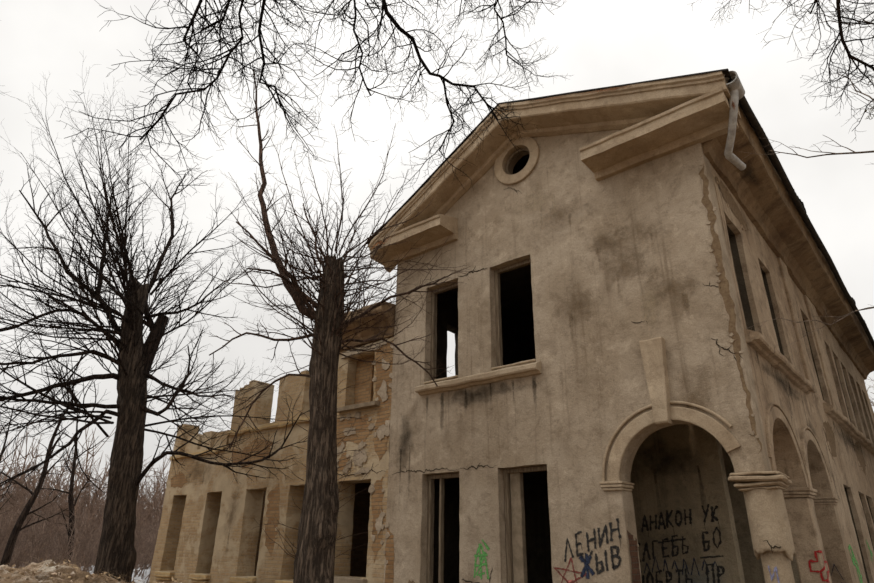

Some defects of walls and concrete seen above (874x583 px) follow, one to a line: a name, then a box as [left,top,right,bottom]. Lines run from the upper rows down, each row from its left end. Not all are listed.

flaking render [699,162,762,454]
flaking render [336,340,394,474]
flaking render [368,476,395,583]